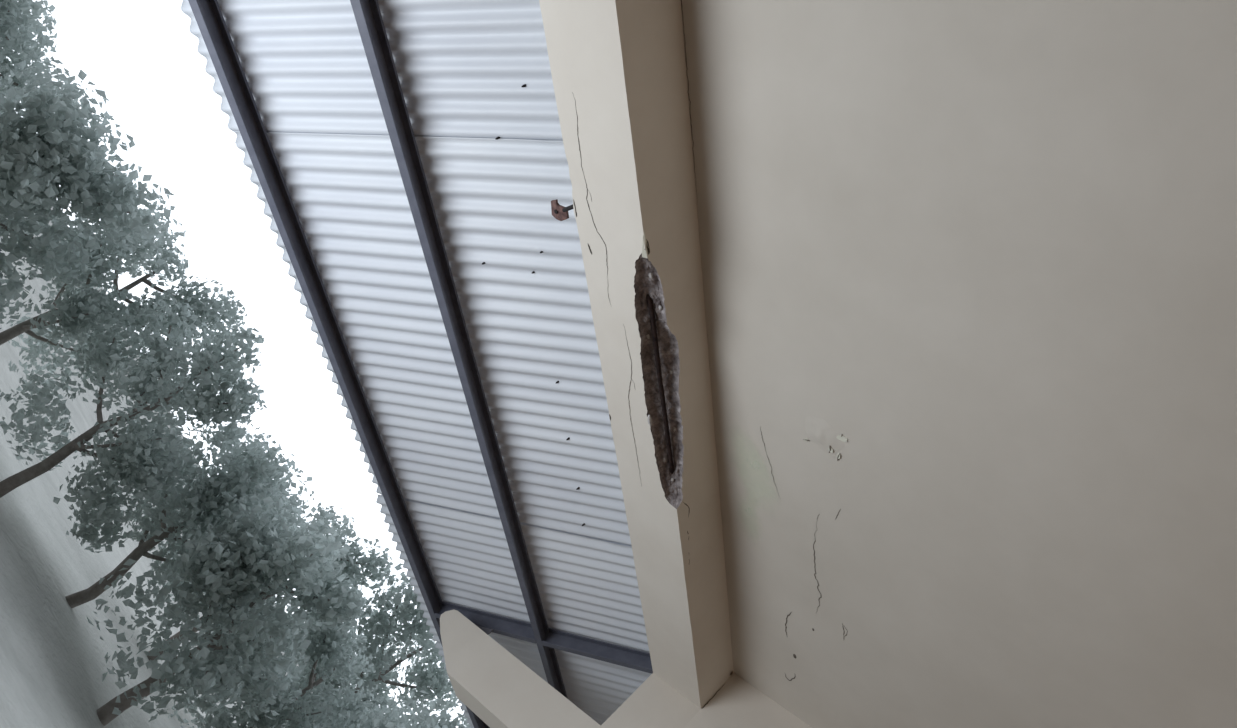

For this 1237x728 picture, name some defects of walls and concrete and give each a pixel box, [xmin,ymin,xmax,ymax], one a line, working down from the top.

crack [573,95,642,485]
spalling [634,233,684,509]
crack [785,509,848,637]